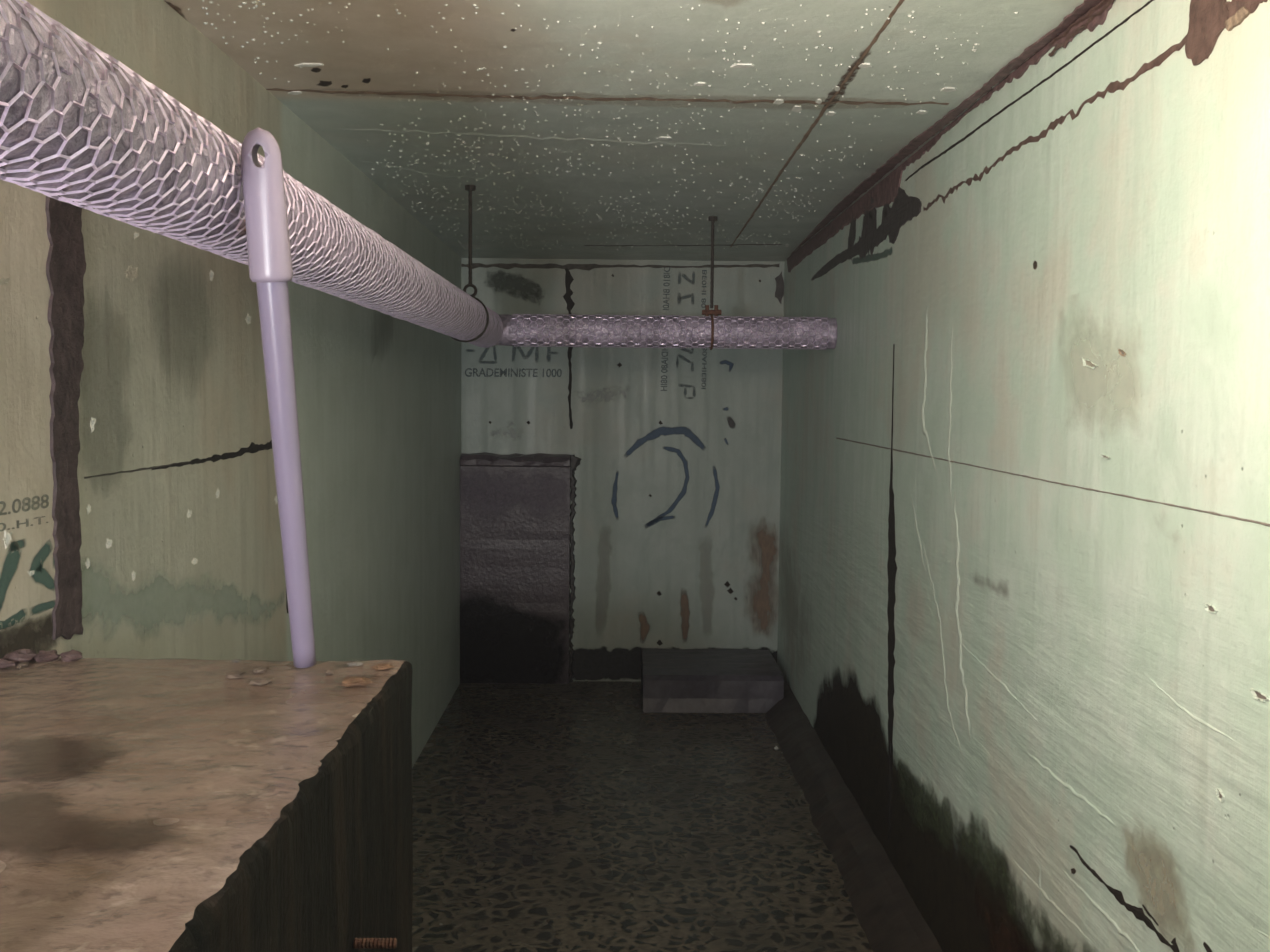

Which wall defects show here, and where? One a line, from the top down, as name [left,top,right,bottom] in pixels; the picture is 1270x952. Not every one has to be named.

crack [266,0,949,316]
crack [905,0,1268,211]
crack [566,347,574,429]
rust [680,592,690,641]
rust [751,526,777,634]
crack [836,344,1270,841]
water stain [814,671,1090,952]
crack [1070,845,1212,952]